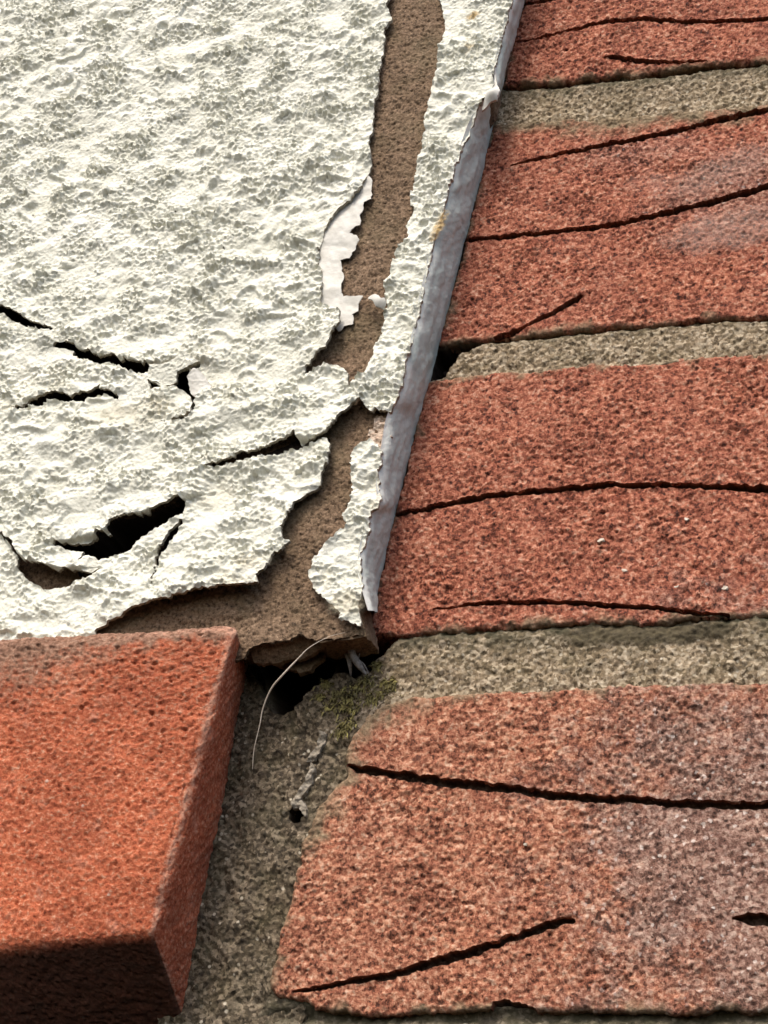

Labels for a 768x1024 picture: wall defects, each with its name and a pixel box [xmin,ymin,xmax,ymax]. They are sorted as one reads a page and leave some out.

crack [514,16,768,43]
peeling [482,75,500,112]
crack [511,107,768,166]
peeling [306,0,445,386]
crack [464,183,768,246]
crack [0,306,212,420]
crack [395,481,768,517]
crack [2,498,185,590]
peeling [96,399,393,677]
crack [433,599,730,620]
crack [347,763,768,810]
crack [292,917,576,993]